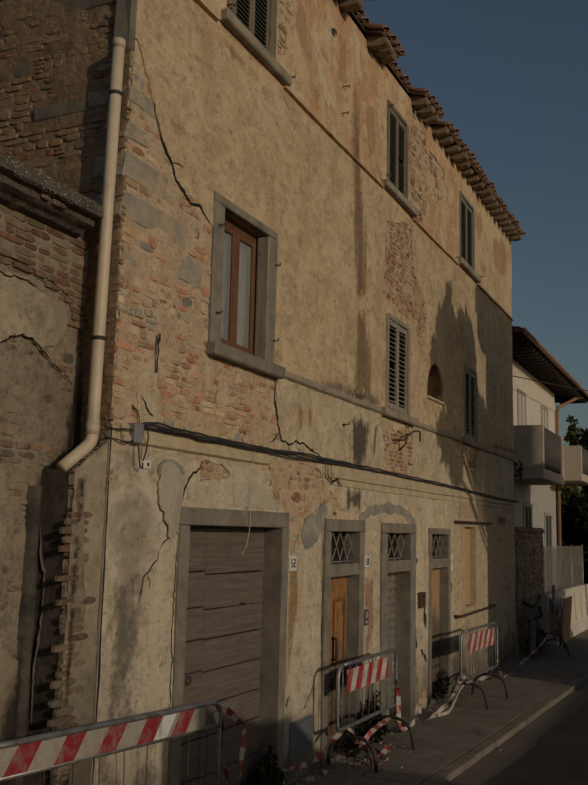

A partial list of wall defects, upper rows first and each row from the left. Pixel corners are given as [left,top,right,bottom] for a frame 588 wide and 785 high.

crack [154,100,212,226]
damp [354,120,366,293]
peeling [382,109,447,346]
peeling [108,102,345,564]
damp [355,312,370,400]
flaking render [0,204,89,660]
crack [182,461,202,501]
crack [270,380,344,493]
damp [353,416,377,465]
peeling [383,425,414,476]
damp [111,591,136,715]
crack [139,533,178,708]